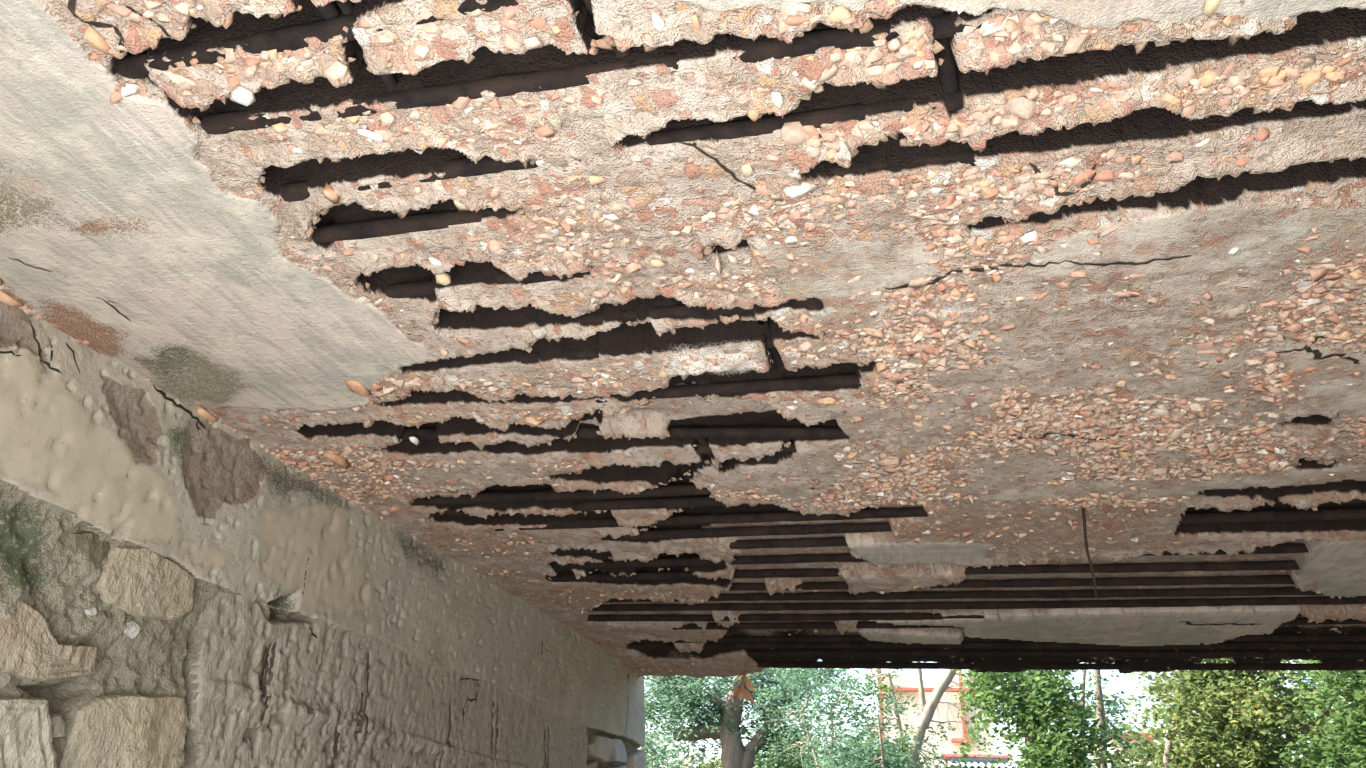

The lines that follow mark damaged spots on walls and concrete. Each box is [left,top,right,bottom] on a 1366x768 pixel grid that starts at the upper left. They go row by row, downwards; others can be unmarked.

crack [678,142,776,205]
peeling [0,280,60,363]
crack [0,320,80,374]
spalling [44,0,1366,583]
crack [884,256,1189,290]
crack [1275,335,1360,364]
spalling [181,236,1366,678]